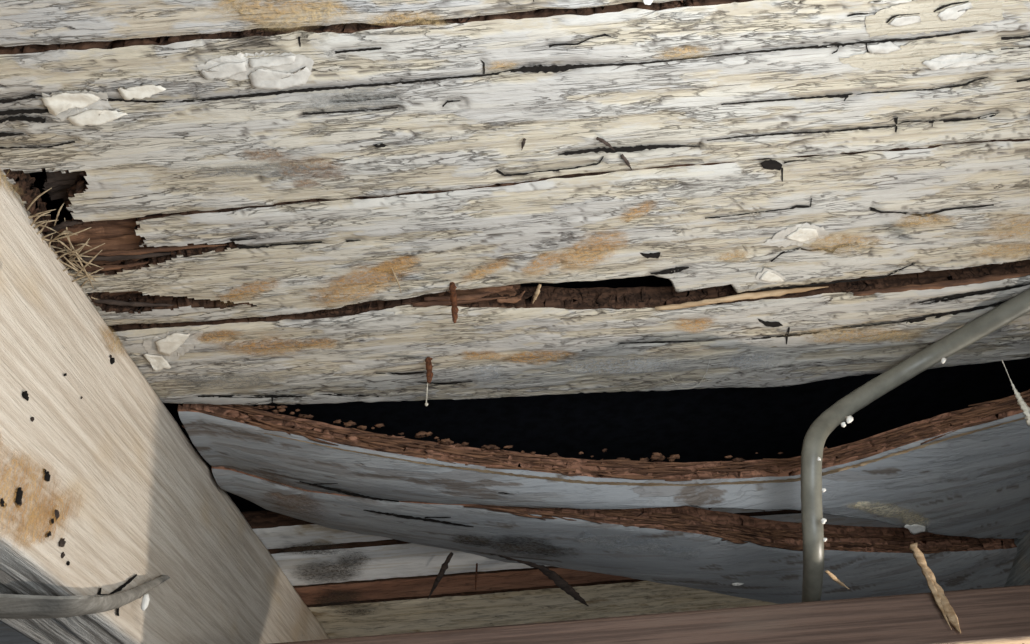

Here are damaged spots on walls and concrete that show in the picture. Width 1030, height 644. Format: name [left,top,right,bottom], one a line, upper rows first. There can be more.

peeling [197,51,314,90]
crack [102,1,1030,115]
peeling [41,84,166,126]
crack [496,113,998,176]
crack [705,198,812,219]
crack [230,238,361,249]
crack [651,267,689,275]
crack [771,244,849,262]
crack [762,263,915,291]
peeling [143,330,203,371]